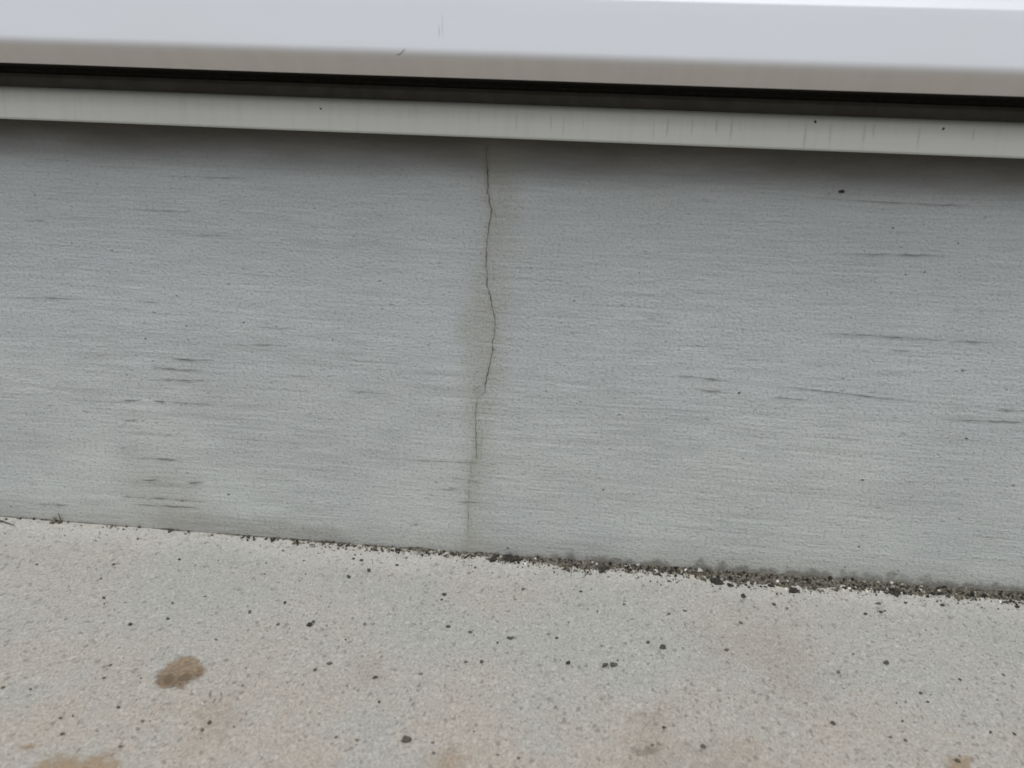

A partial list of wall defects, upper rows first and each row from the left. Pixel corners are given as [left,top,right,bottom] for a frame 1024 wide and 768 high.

crack [468,139,497,518]